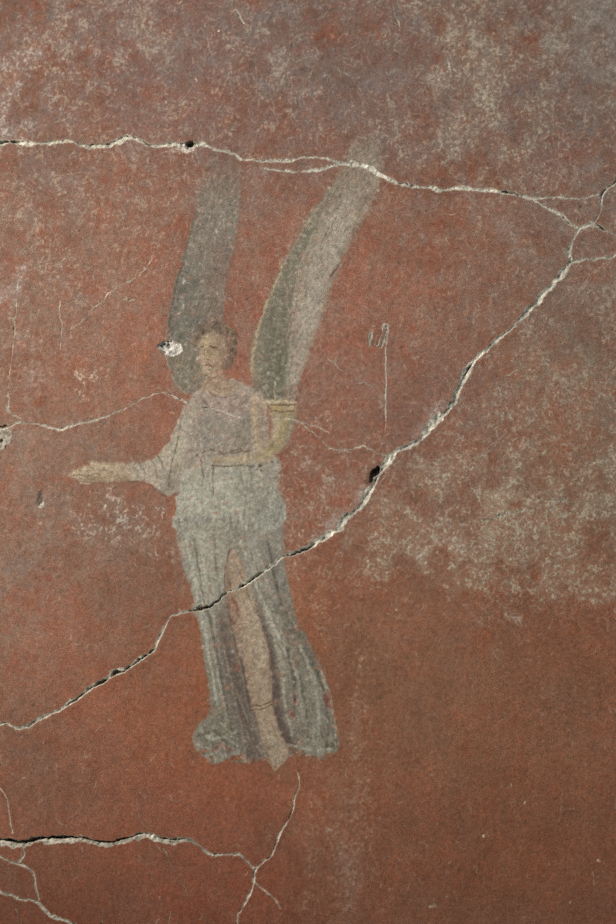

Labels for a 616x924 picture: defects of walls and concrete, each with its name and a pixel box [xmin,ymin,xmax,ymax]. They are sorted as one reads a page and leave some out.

spalling [157,337,183,357]
crack [0,129,616,737]
crack [0,769,304,924]